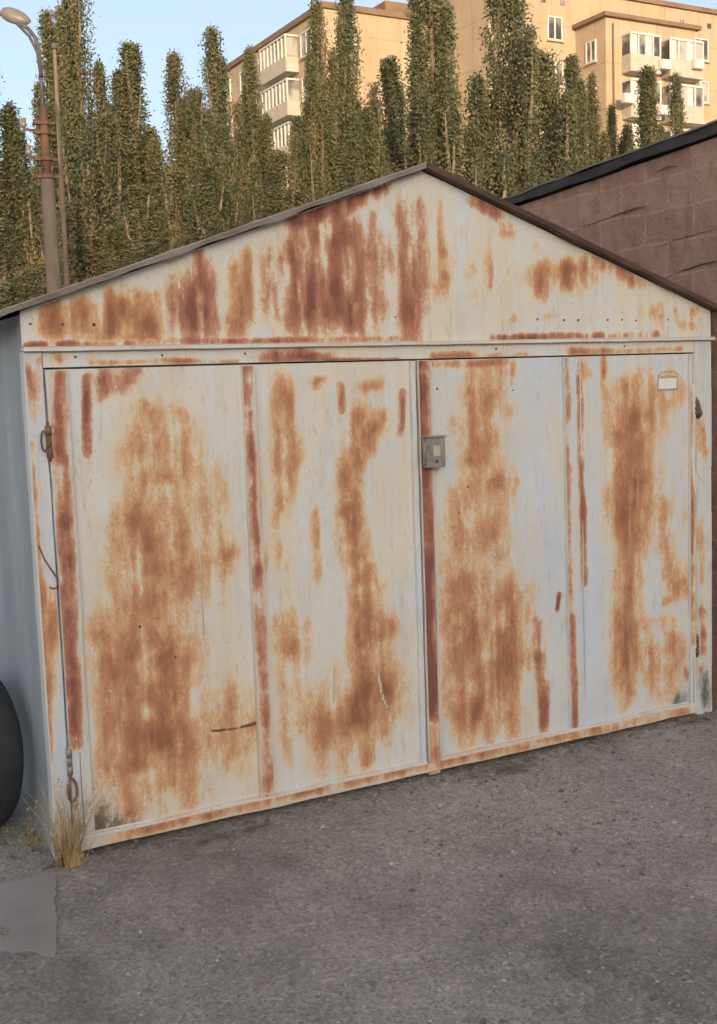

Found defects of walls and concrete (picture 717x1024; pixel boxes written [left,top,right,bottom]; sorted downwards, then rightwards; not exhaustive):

corrosion [20,172,712,846]